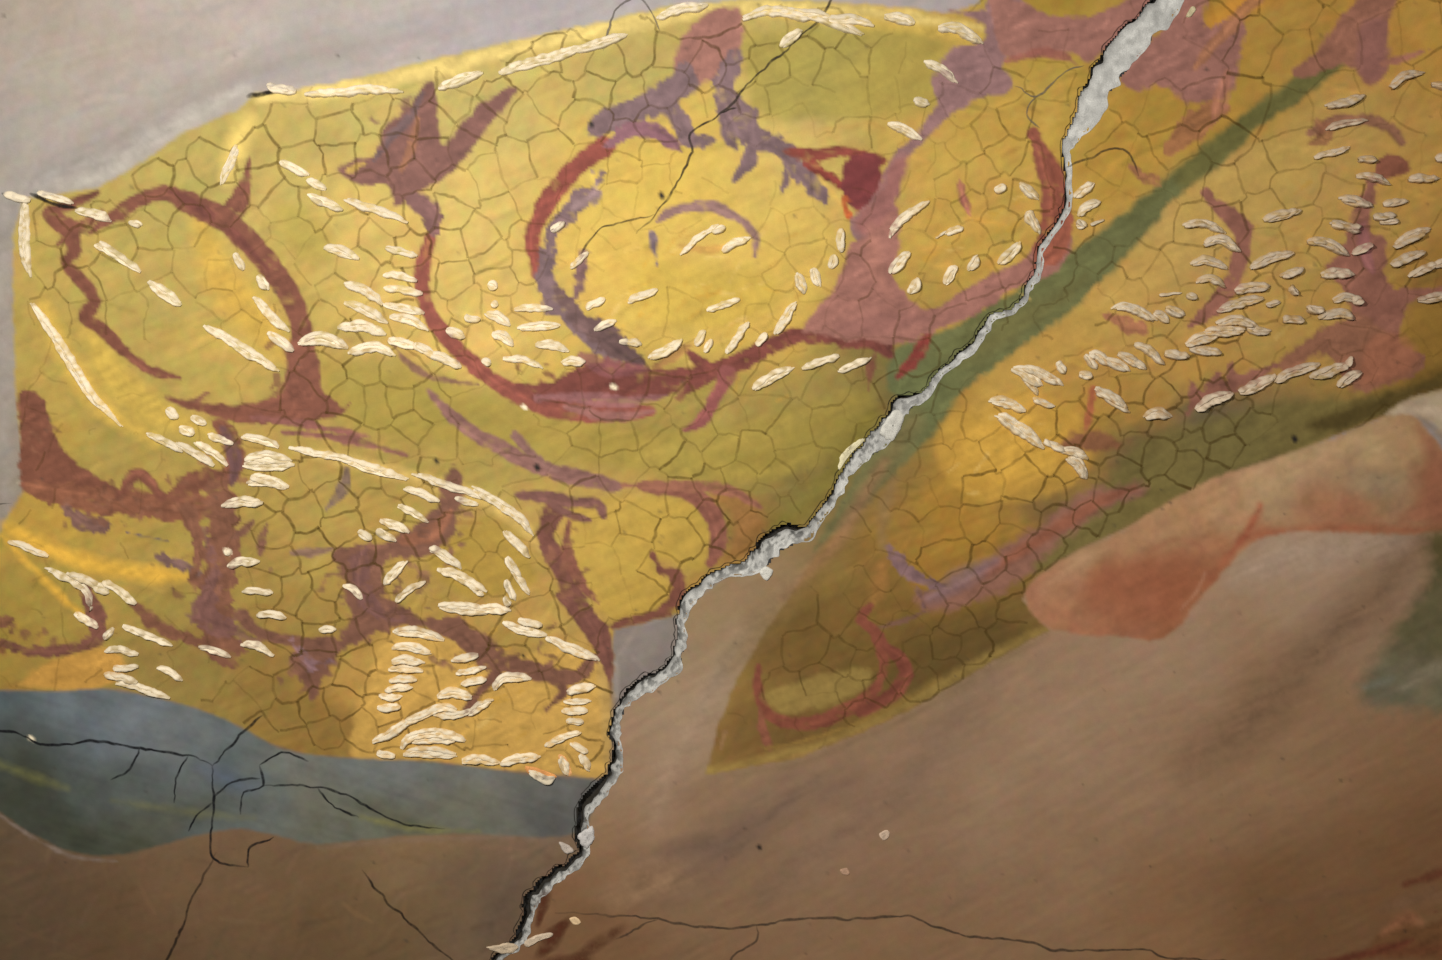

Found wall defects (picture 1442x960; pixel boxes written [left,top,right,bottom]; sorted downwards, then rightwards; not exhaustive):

crack [486,0,1201,960]
peeling [838,438,864,470]
crack [0,717,429,866]
crack [166,891,196,960]
crack [369,880,441,951]